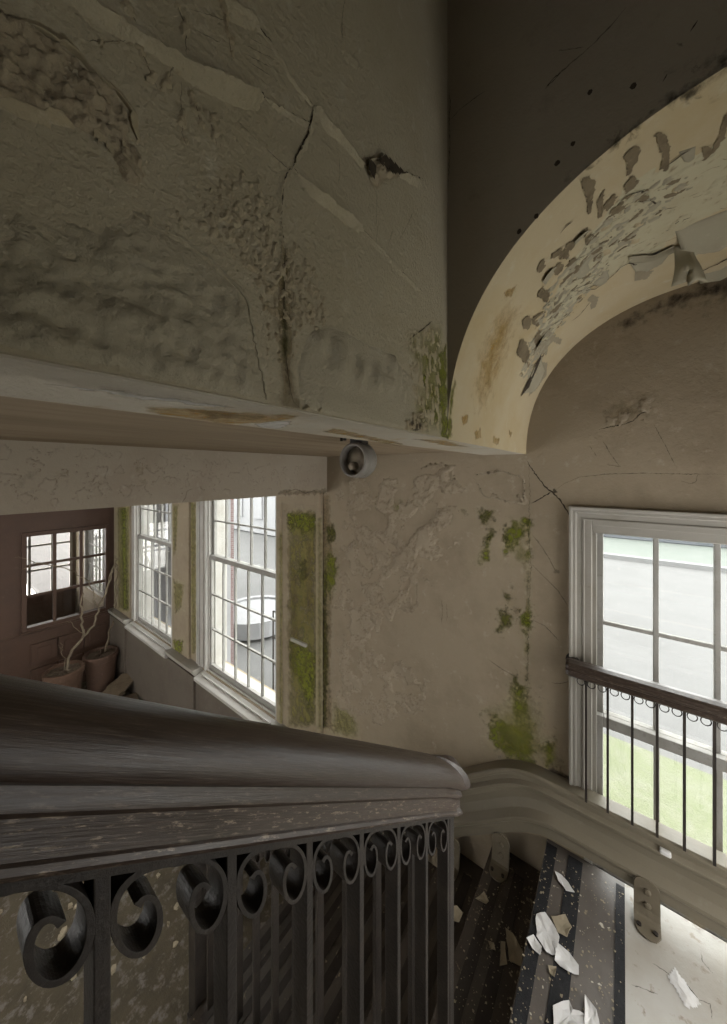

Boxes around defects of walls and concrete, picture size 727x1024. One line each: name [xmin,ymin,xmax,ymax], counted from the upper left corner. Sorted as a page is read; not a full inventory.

spalling [363,154,424,190]
crack [71,0,423,404]
peeling [517,114,727,396]
leakage [74,387,294,429]
crack [527,461,698,514]